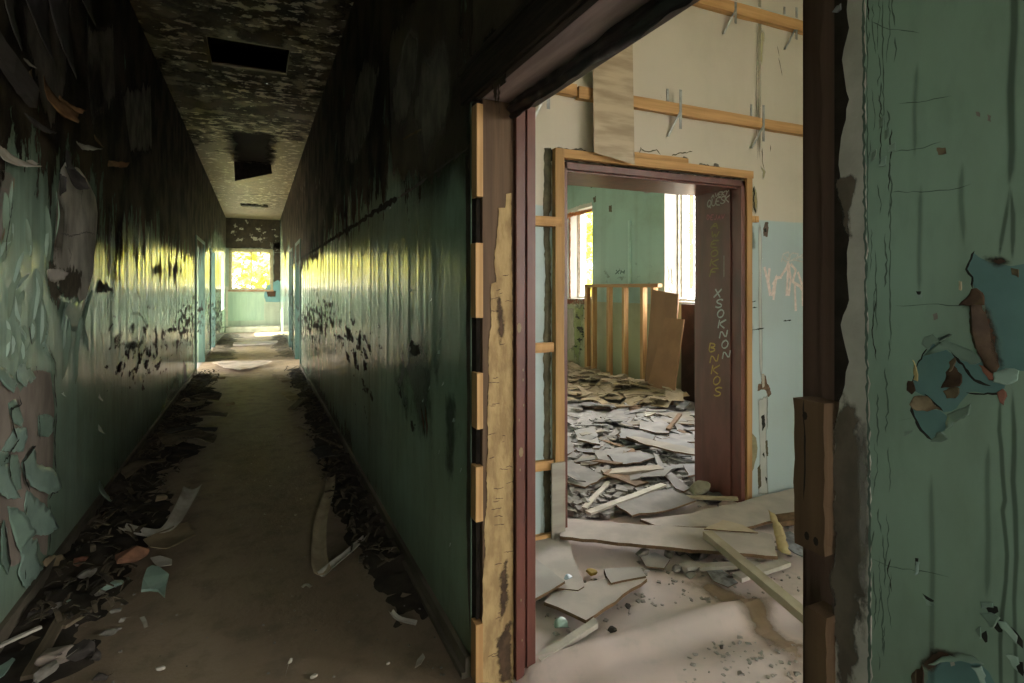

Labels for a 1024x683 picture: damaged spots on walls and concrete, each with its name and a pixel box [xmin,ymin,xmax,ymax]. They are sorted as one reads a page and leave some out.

peeling [5,0,152,168]
peeling [138,0,354,210]
crack [866,0,970,670]
peeling [904,252,1024,442]
peeling [0,362,66,589]
peeling [911,649,994,683]
peeling [975,602,1024,676]